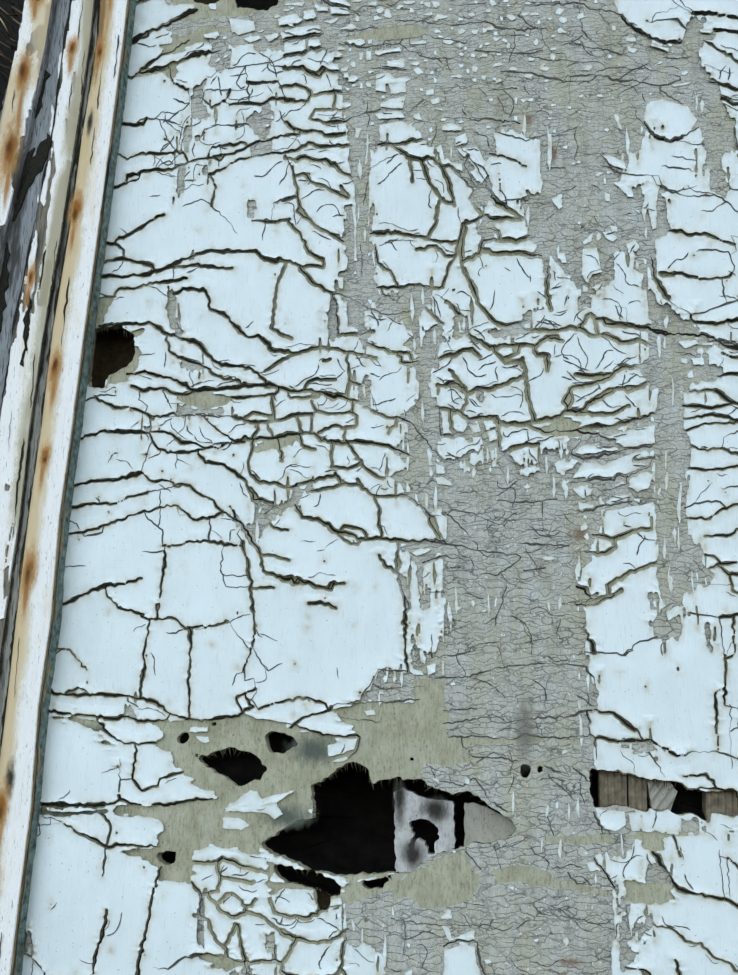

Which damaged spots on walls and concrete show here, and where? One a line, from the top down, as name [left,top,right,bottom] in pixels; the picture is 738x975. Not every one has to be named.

corrosion [1,50,31,204]
corrosion [67,38,77,72]
peeling [425,160,451,201]
crack [322,0,738,212]
peeling [102,245,151,276]
crack [438,230,738,369]
corrosion [49,351,62,404]
peeling [0,0,127,975]
peeling [273,391,355,433]
crack [38,33,658,873]
corrosion [22,553,36,612]
crack [137,857,367,975]